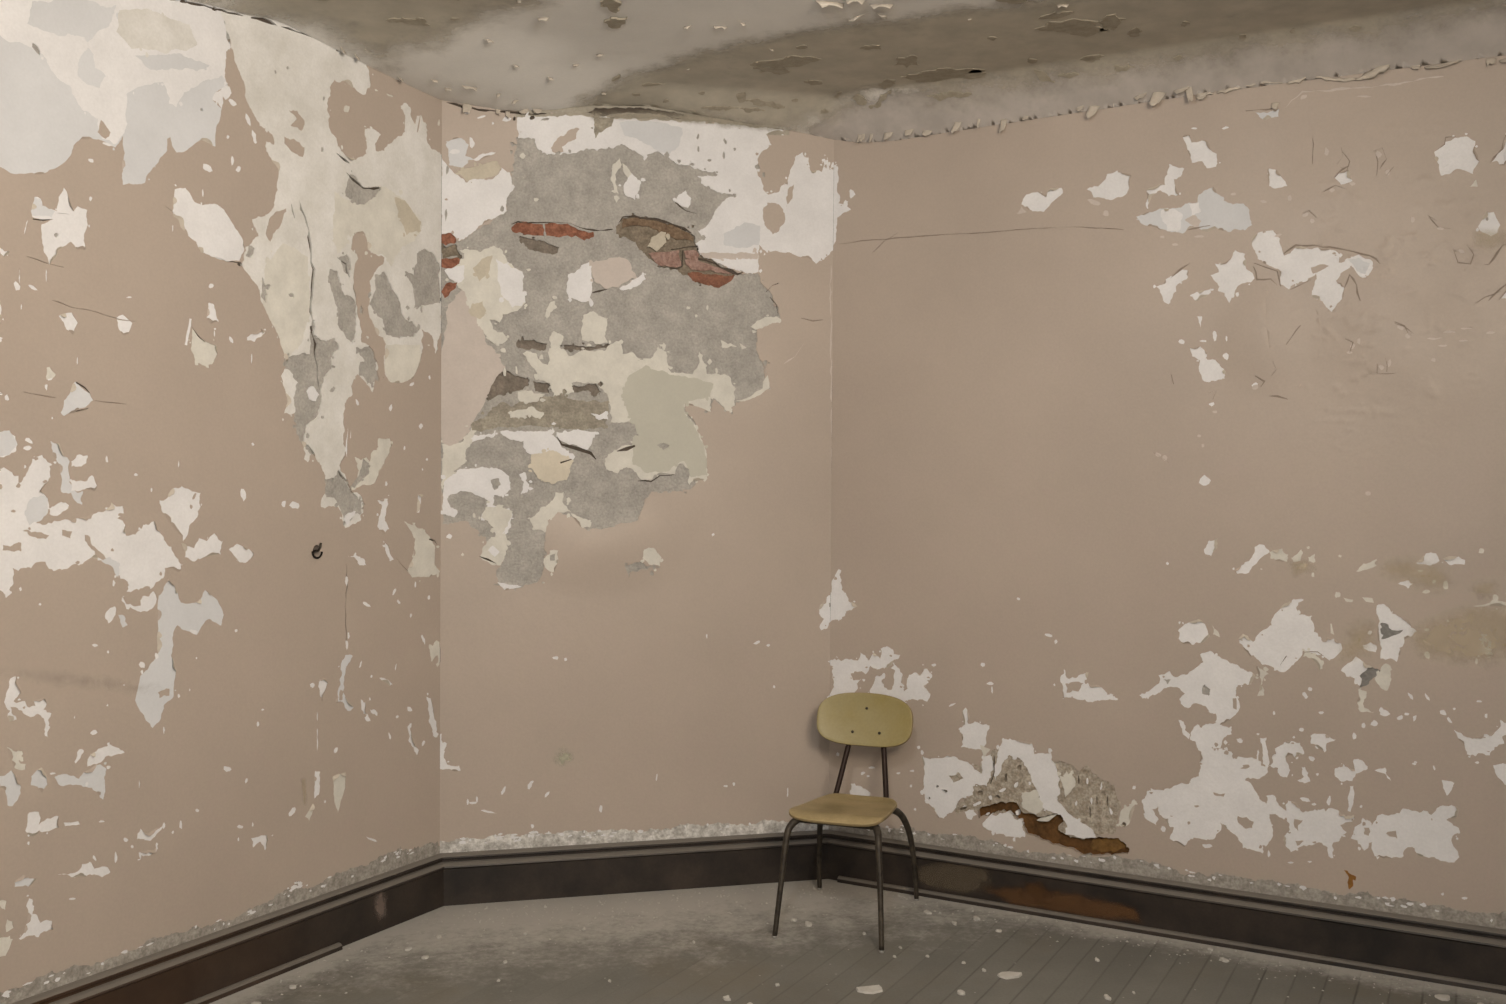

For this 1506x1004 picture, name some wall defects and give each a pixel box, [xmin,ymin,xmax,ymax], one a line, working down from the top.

peeling [1035,4,1142,37]
peeling [1434,133,1506,187]
peeling [1017,188,1063,214]
crack [844,228,1045,249]
peeling [1453,212,1506,265]
peeling [1087,127,1380,413]
spalling [0,0,986,600]
peeling [0,430,254,733]
peeling [819,569,857,630]
peeling [1398,548,1484,594]
peeling [0,592,1506,1004]